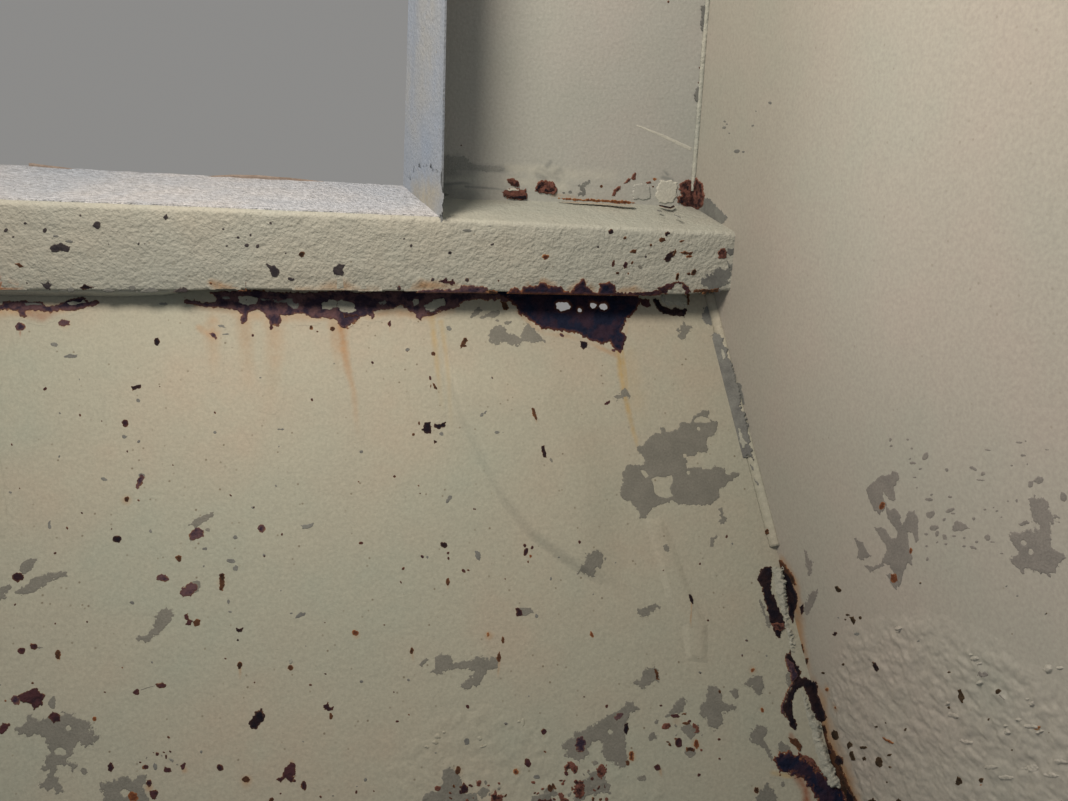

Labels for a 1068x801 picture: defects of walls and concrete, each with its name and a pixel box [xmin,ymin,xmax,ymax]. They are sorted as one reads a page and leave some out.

corrosion [677,178,705,210]
corrosion [0,263,96,338]
corrosion [173,277,468,453]
corrosion [266,263,382,291]
corrosion [397,229,697,454]
peeling [618,248,759,547]
peeling [854,471,994,590]
peeling [972,476,1067,578]
peeling [14,696,99,795]
peeling [99,772,158,801]
peeling [559,664,660,771]
corrosion [751,549,894,801]